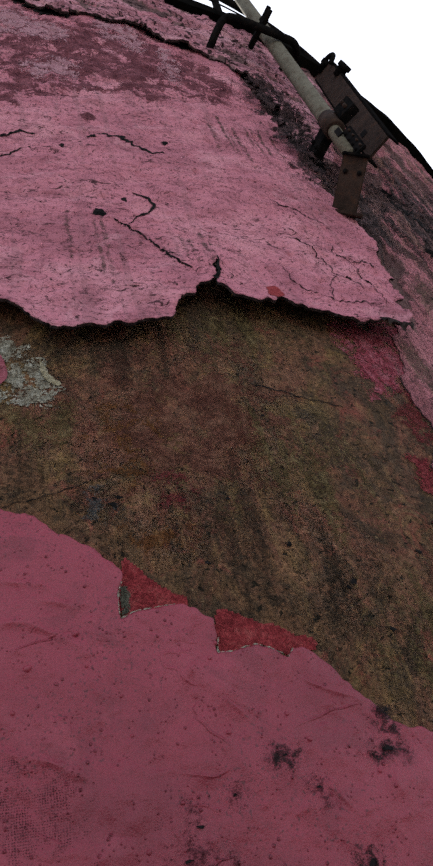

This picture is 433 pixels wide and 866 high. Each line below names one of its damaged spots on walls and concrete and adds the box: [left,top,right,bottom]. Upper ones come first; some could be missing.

peeling [0,0,246,114]
crack [98,133,166,154]
crack [113,192,193,268]
crack [212,255,221,278]
spalling [0,262,433,732]